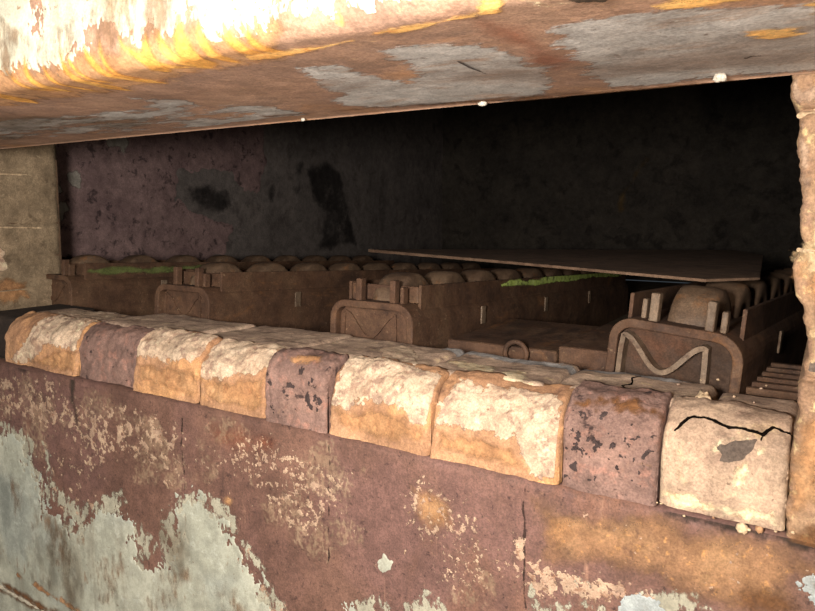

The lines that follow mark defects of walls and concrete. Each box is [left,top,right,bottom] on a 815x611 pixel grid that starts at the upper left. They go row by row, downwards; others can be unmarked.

peeling [0,0,337,76]
corrosion [0,0,349,106]
peeling [295,42,555,108]
corrosion [449,0,503,20]
peeling [547,3,815,104]
corrosion [652,0,741,9]
peeling [0,366,343,611]
crack [674,415,793,441]
spalling [716,439,757,463]
corrosion [0,582,79,611]
peeling [400,475,713,611]
corrosion [549,518,808,602]